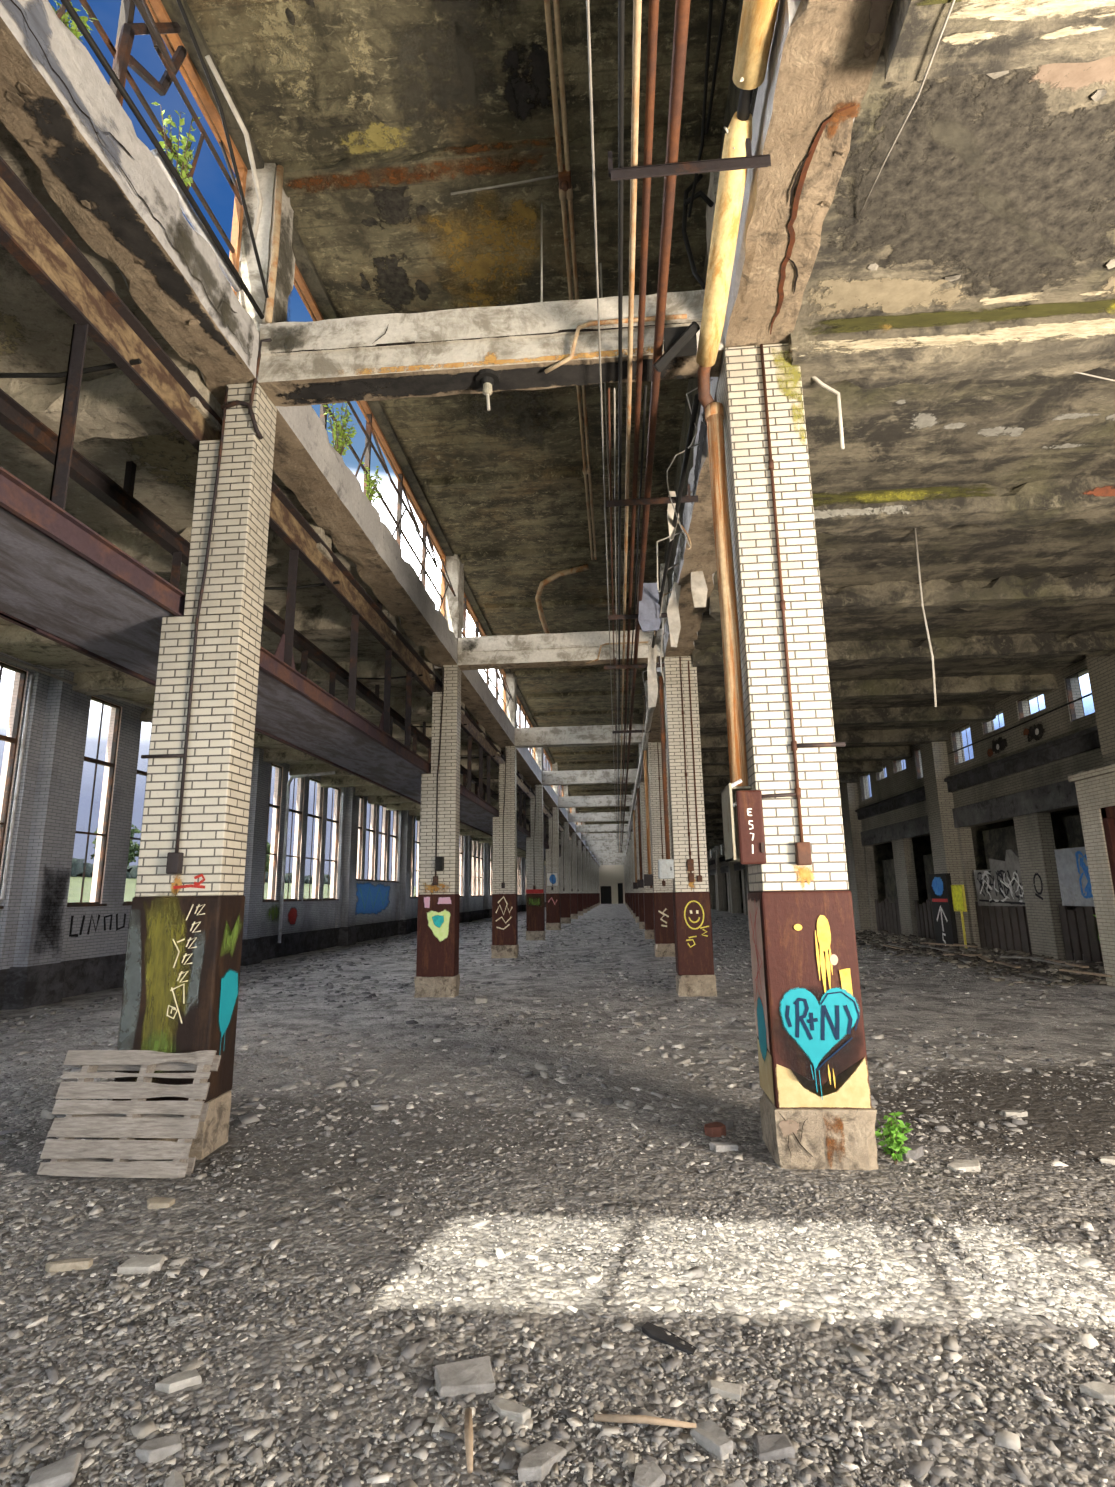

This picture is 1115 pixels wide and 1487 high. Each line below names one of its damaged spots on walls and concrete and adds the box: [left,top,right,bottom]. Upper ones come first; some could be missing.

leakage [341,0,552,154]
leakage [161,187,303,365]
corrosion [286,137,562,195]
leakage [424,193,541,308]
crack [770,105,855,334]
leakage [793,291,1115,357]
peeling [806,55,1115,316]